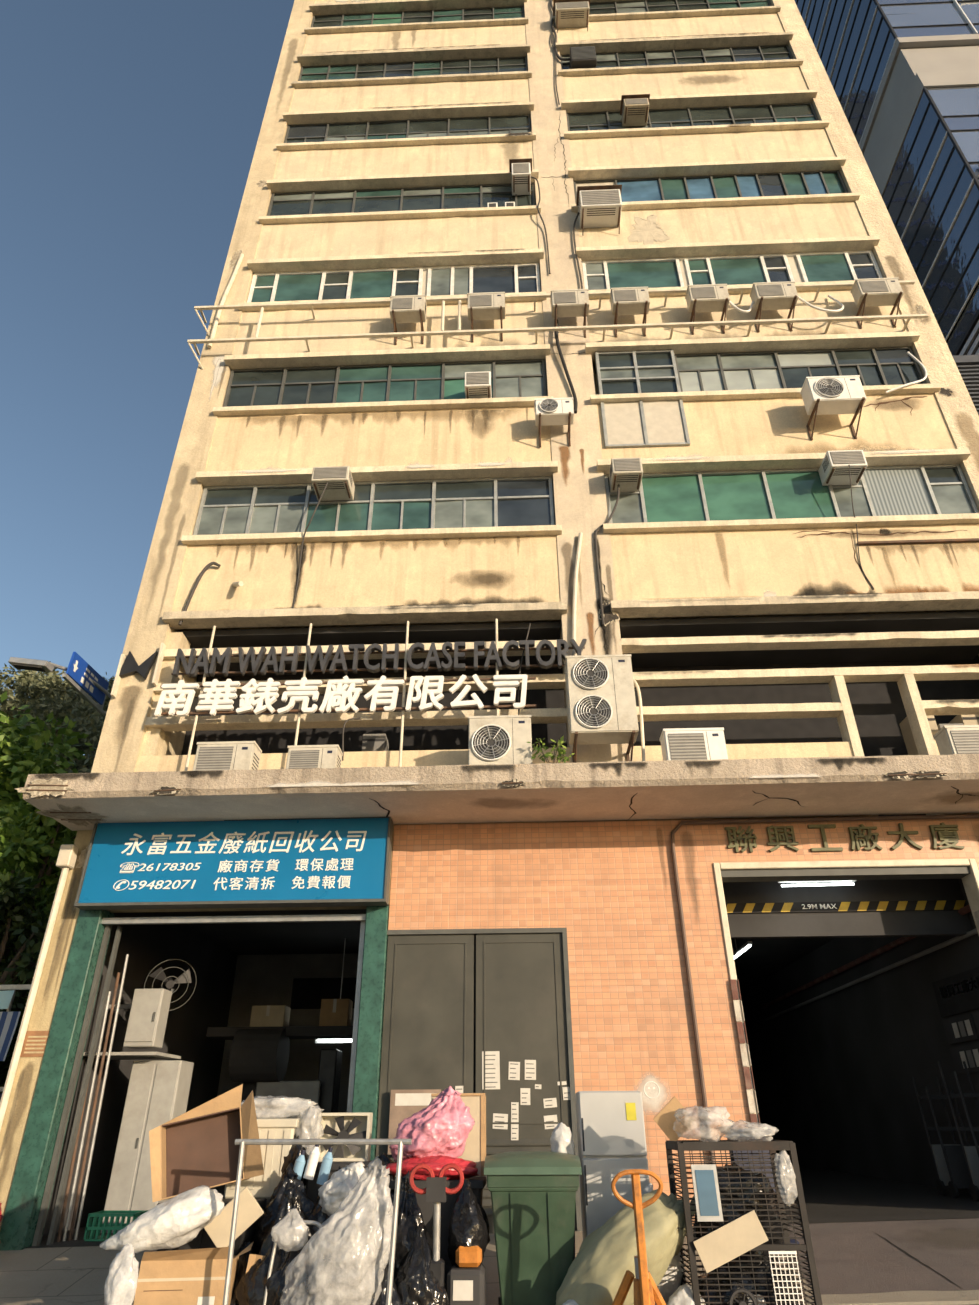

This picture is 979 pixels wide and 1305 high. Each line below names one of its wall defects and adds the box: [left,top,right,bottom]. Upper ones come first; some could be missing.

corrosion [559,446,584,479]
water stain [794,585,881,597]